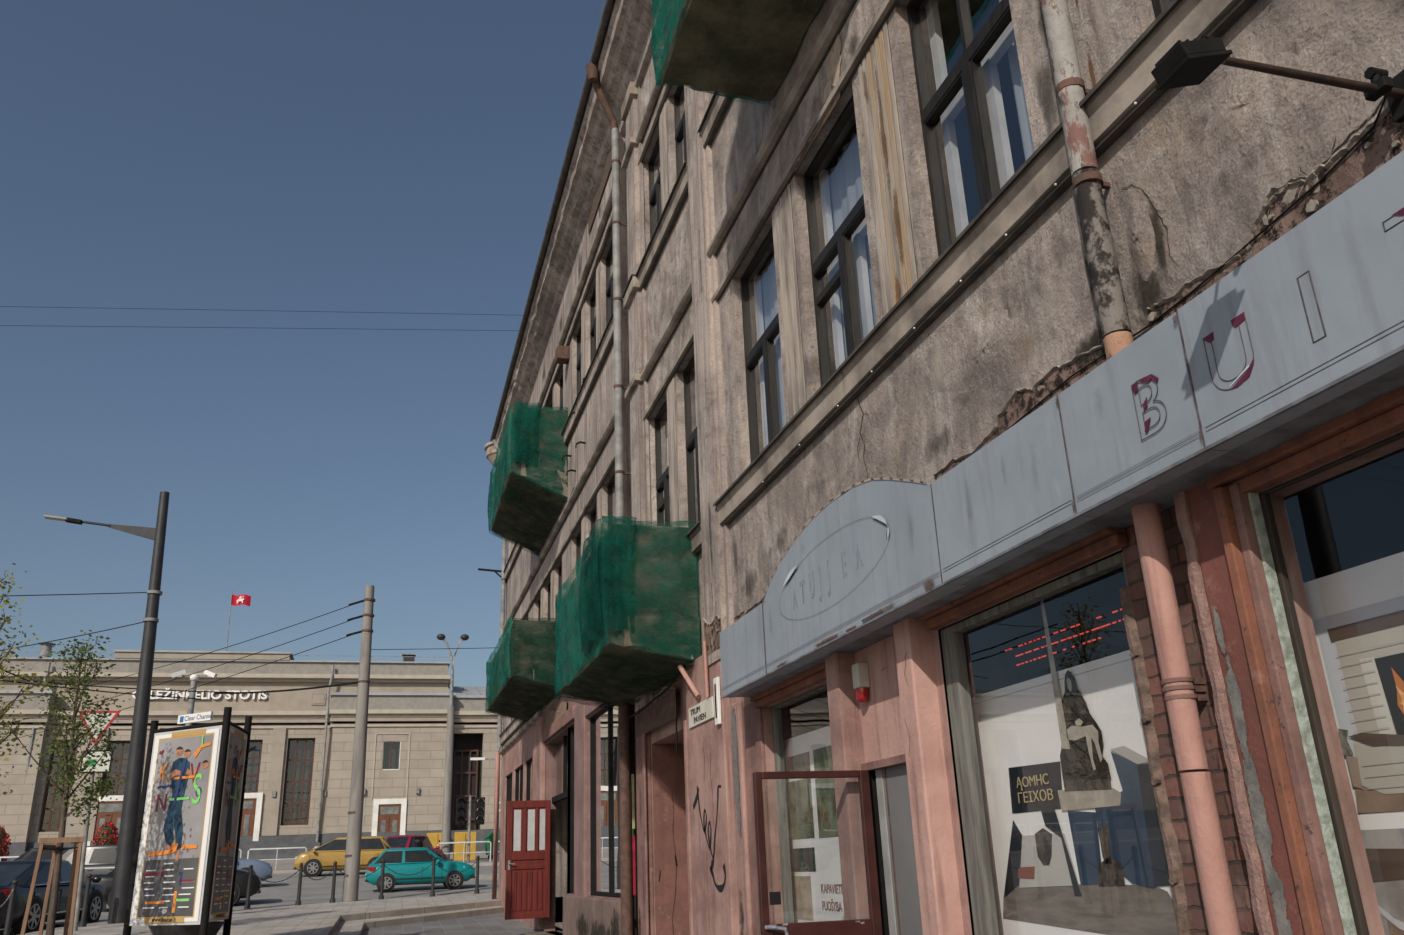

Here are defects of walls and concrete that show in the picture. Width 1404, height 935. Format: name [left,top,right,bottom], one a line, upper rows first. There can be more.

rust [1088,59,1096,87]
crack [1121,184,1178,268]
spalling [1147,104,1404,327]
spalling [933,340,1107,481]
peeling [1213,606,1293,935]
damp [576,911,618,935]